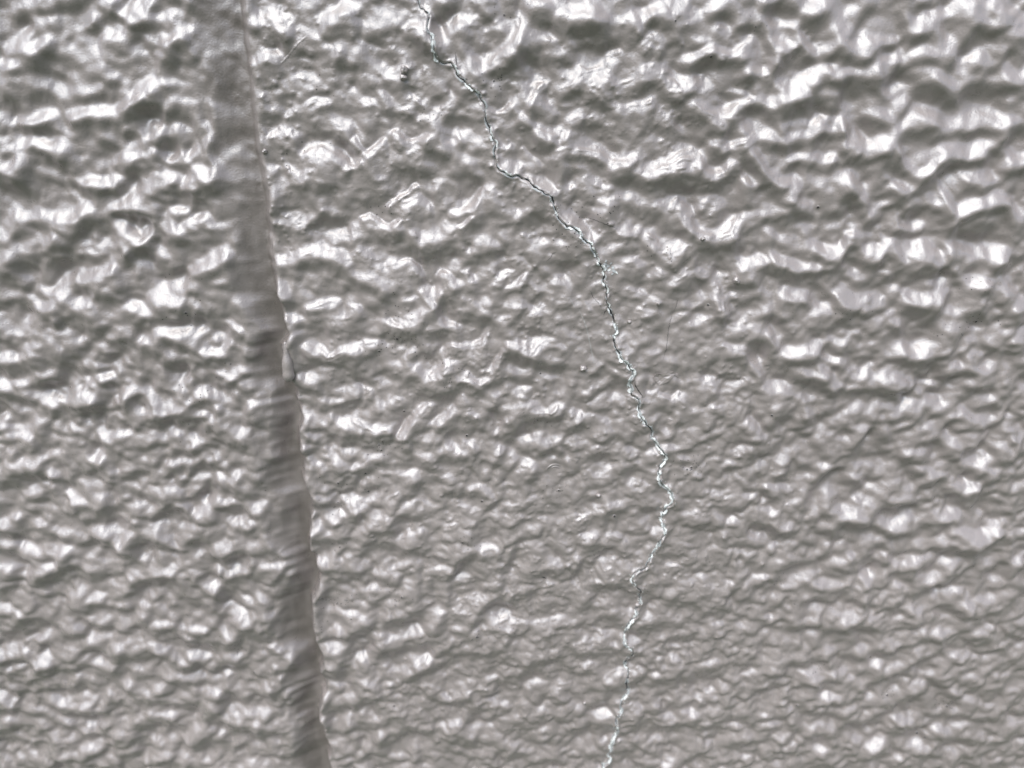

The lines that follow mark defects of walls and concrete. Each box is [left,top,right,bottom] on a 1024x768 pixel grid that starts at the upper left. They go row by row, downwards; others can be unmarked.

crack [417,0,676,768]